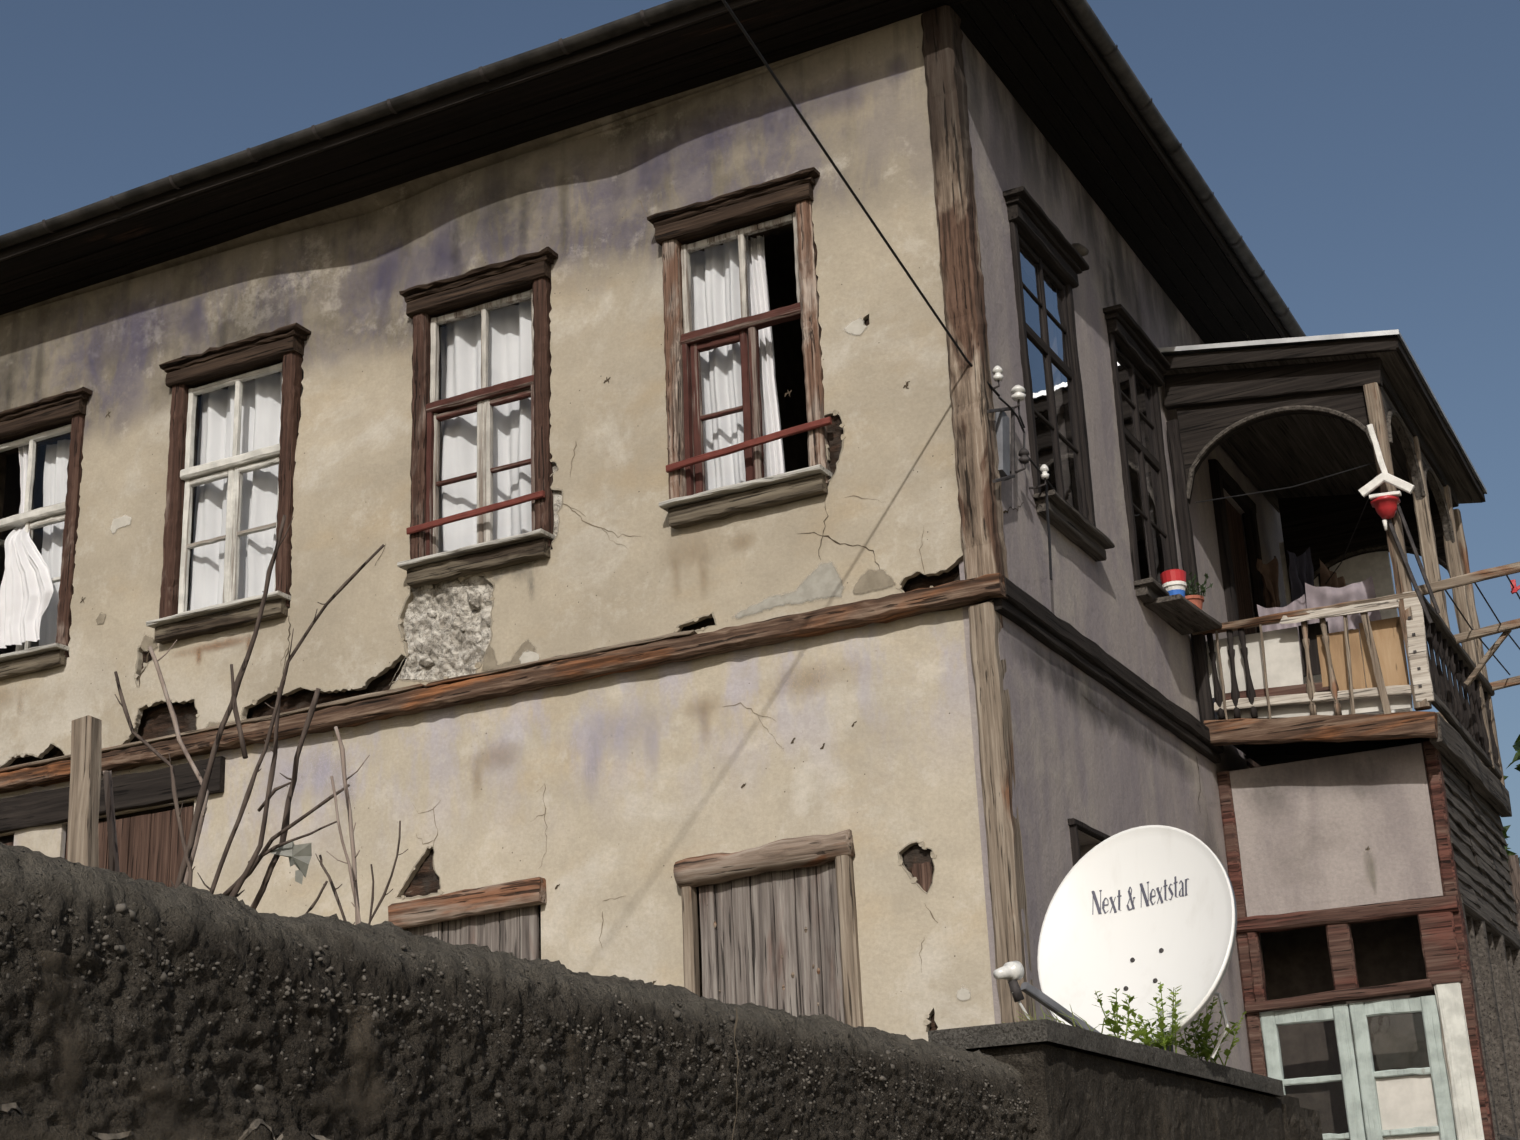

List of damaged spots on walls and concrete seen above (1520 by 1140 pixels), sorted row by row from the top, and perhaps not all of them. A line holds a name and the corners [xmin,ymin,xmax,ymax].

crack [564,443,642,545]
crack [799,479,880,570]
flaking render [896,565,960,593]
flaking render [121,574,539,745]
flaking render [1,743,65,766]